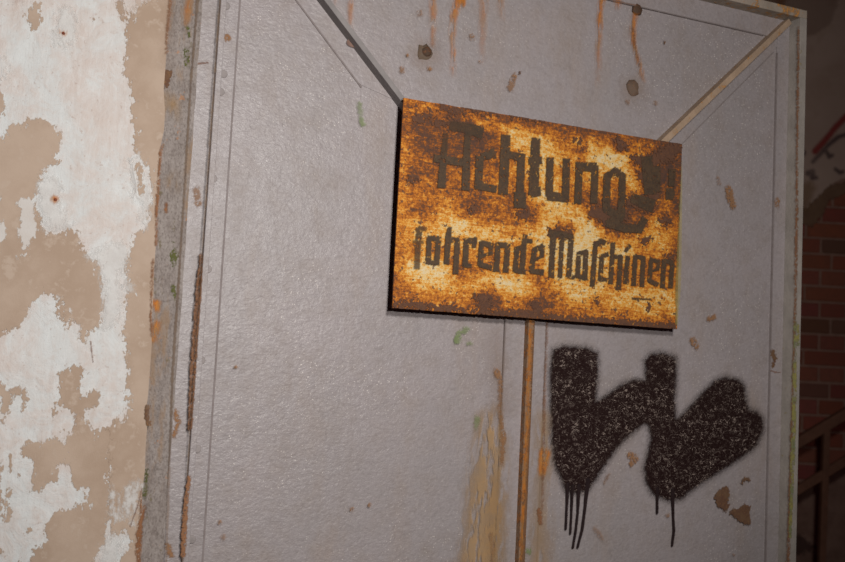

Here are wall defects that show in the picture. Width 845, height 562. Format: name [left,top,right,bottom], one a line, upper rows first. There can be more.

flaking render [0,0,172,562]
corrosion [164,0,231,562]
spalling [803,181,845,227]
corrosion [139,469,148,560]
corrosion [462,369,507,562]
corrosion [520,319,550,562]
peeling [714,486,751,525]